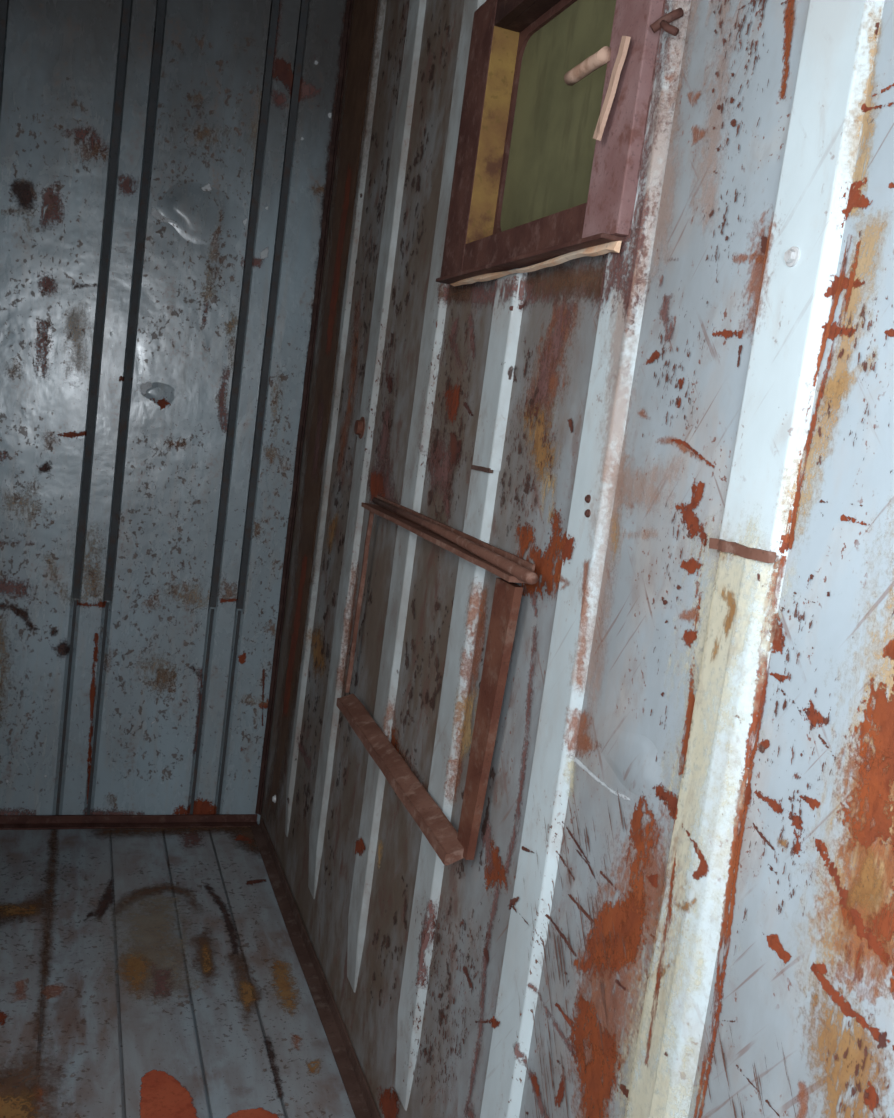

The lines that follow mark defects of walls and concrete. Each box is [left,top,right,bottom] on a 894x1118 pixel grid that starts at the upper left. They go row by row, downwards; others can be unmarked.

corrosion [66,127,108,160]
corrosion [11,181,64,227]
corrosion [371,0,776,1118]
corrosion [568,0,894,1118]
corrosion [265,1037,283,1097]